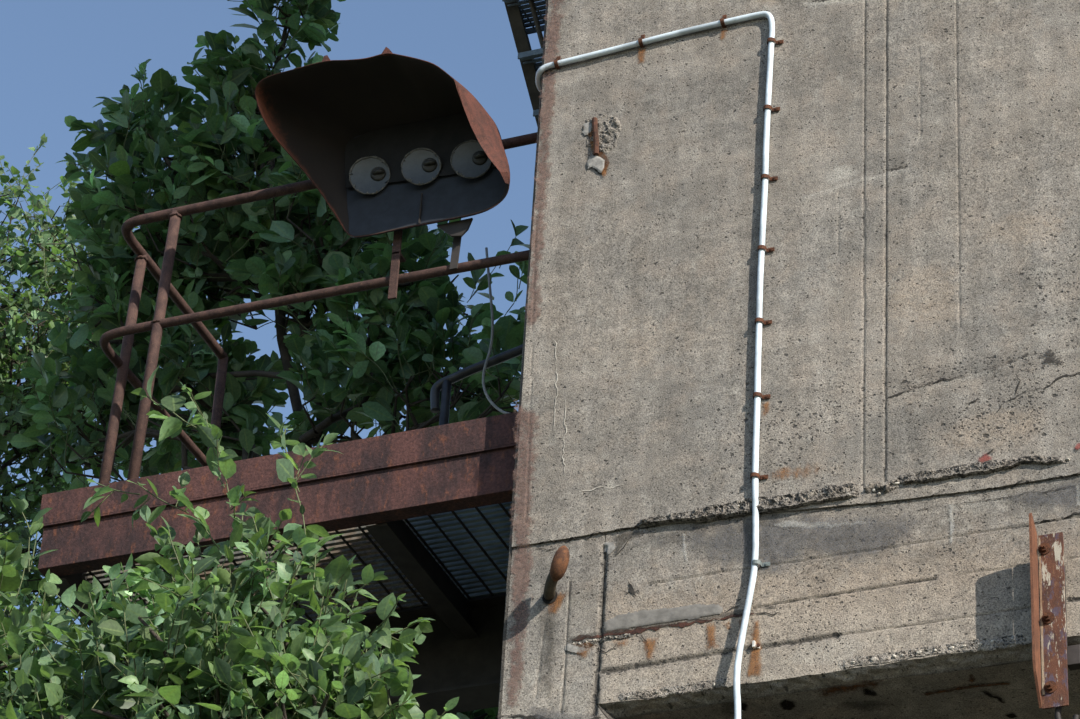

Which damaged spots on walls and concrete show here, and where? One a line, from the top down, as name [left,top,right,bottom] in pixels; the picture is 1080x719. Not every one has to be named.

crack [887,369,1080,411]
spalling [604,455,1070,555]
corrosion [565,603,761,676]